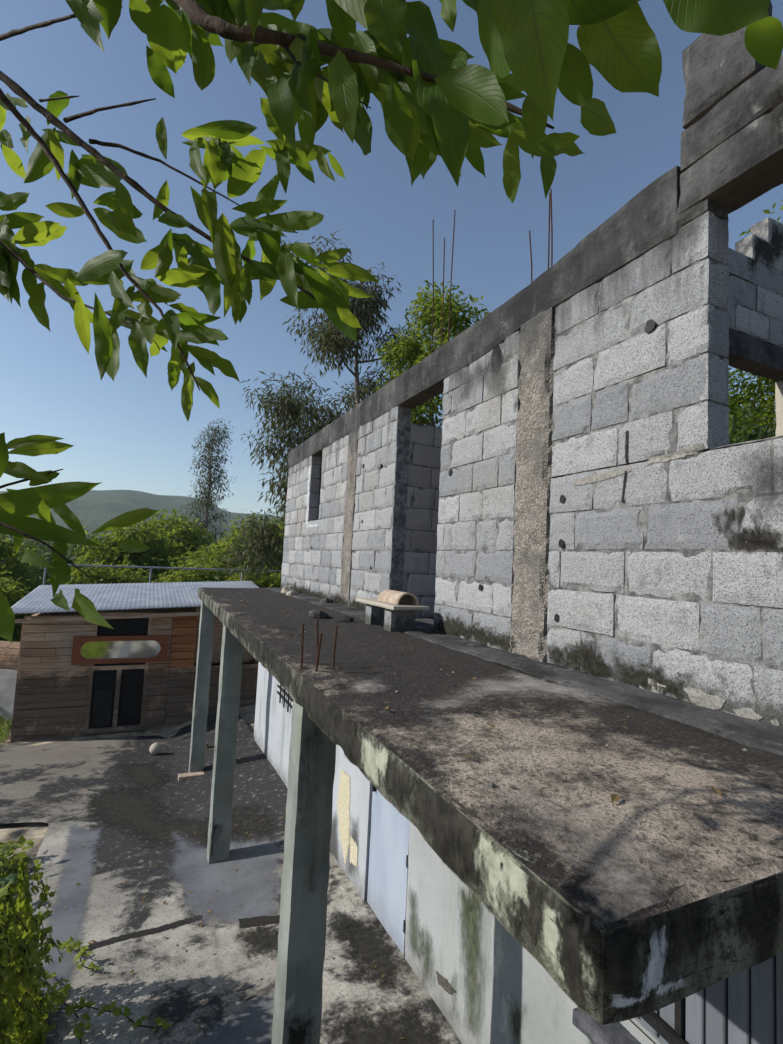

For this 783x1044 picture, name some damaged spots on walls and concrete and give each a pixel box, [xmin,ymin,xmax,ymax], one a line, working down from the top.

leakage [716,507,783,559]
leakage [384,753,783,1030]